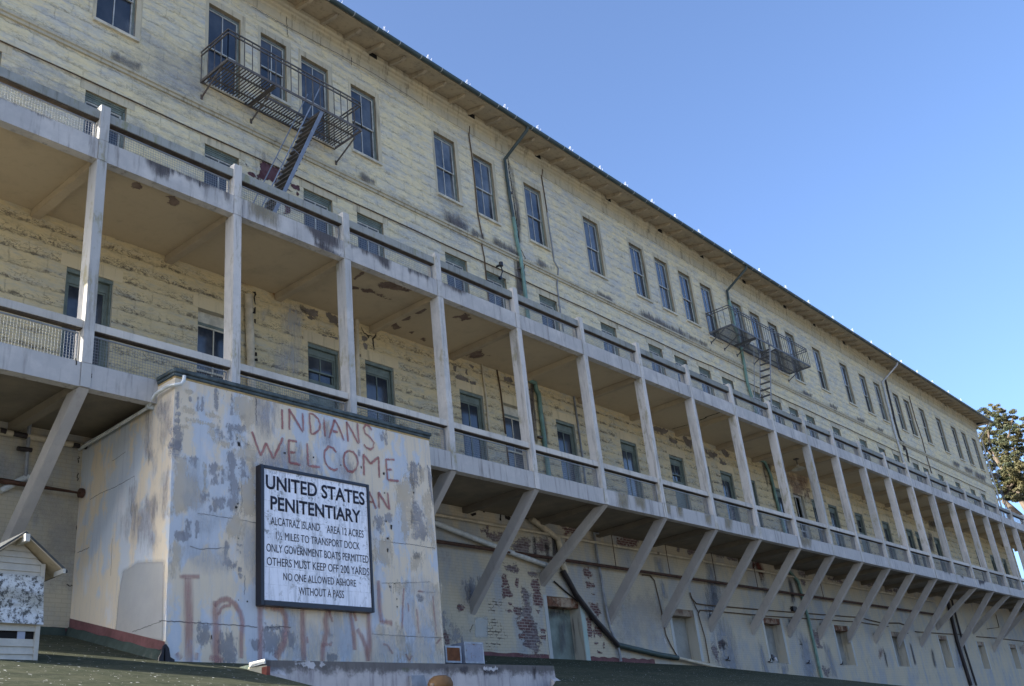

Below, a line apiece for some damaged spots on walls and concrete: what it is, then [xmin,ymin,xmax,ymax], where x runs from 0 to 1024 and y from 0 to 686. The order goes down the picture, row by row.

damp [149,160,230,196]
peeling [245,162,280,183]
damp [307,226,340,255]
spalling [352,272,412,300]
spalling [471,511,550,655]
spalling [583,567,605,653]